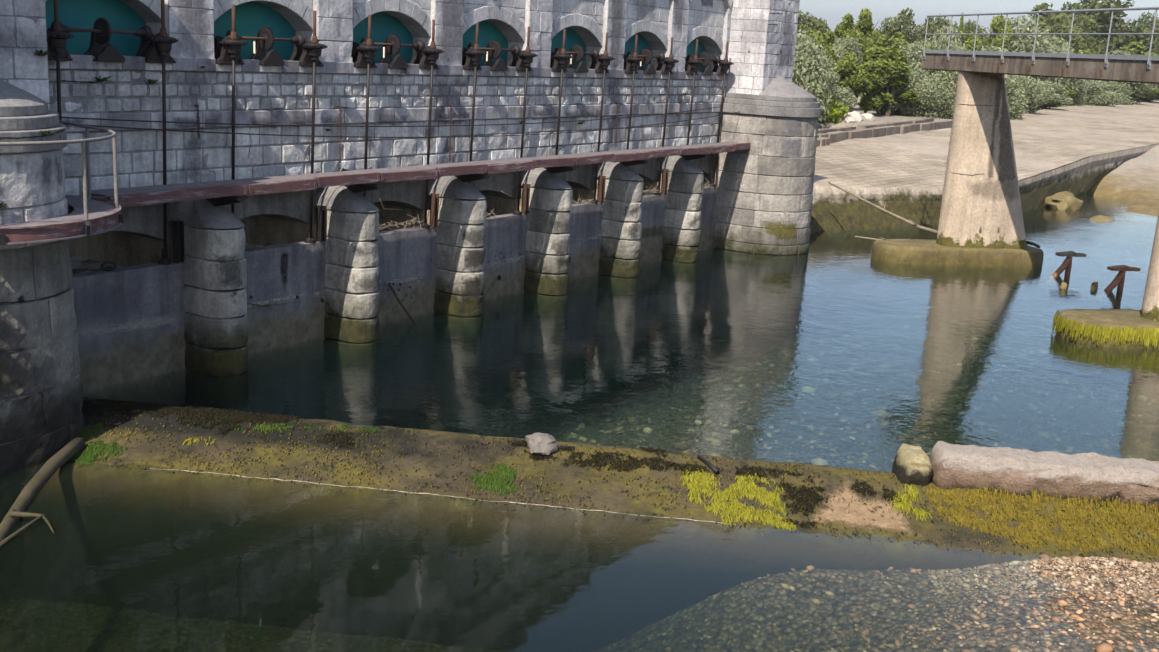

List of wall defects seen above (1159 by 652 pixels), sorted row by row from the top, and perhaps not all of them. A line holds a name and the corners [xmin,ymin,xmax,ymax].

leakage [988,80,1015,181]